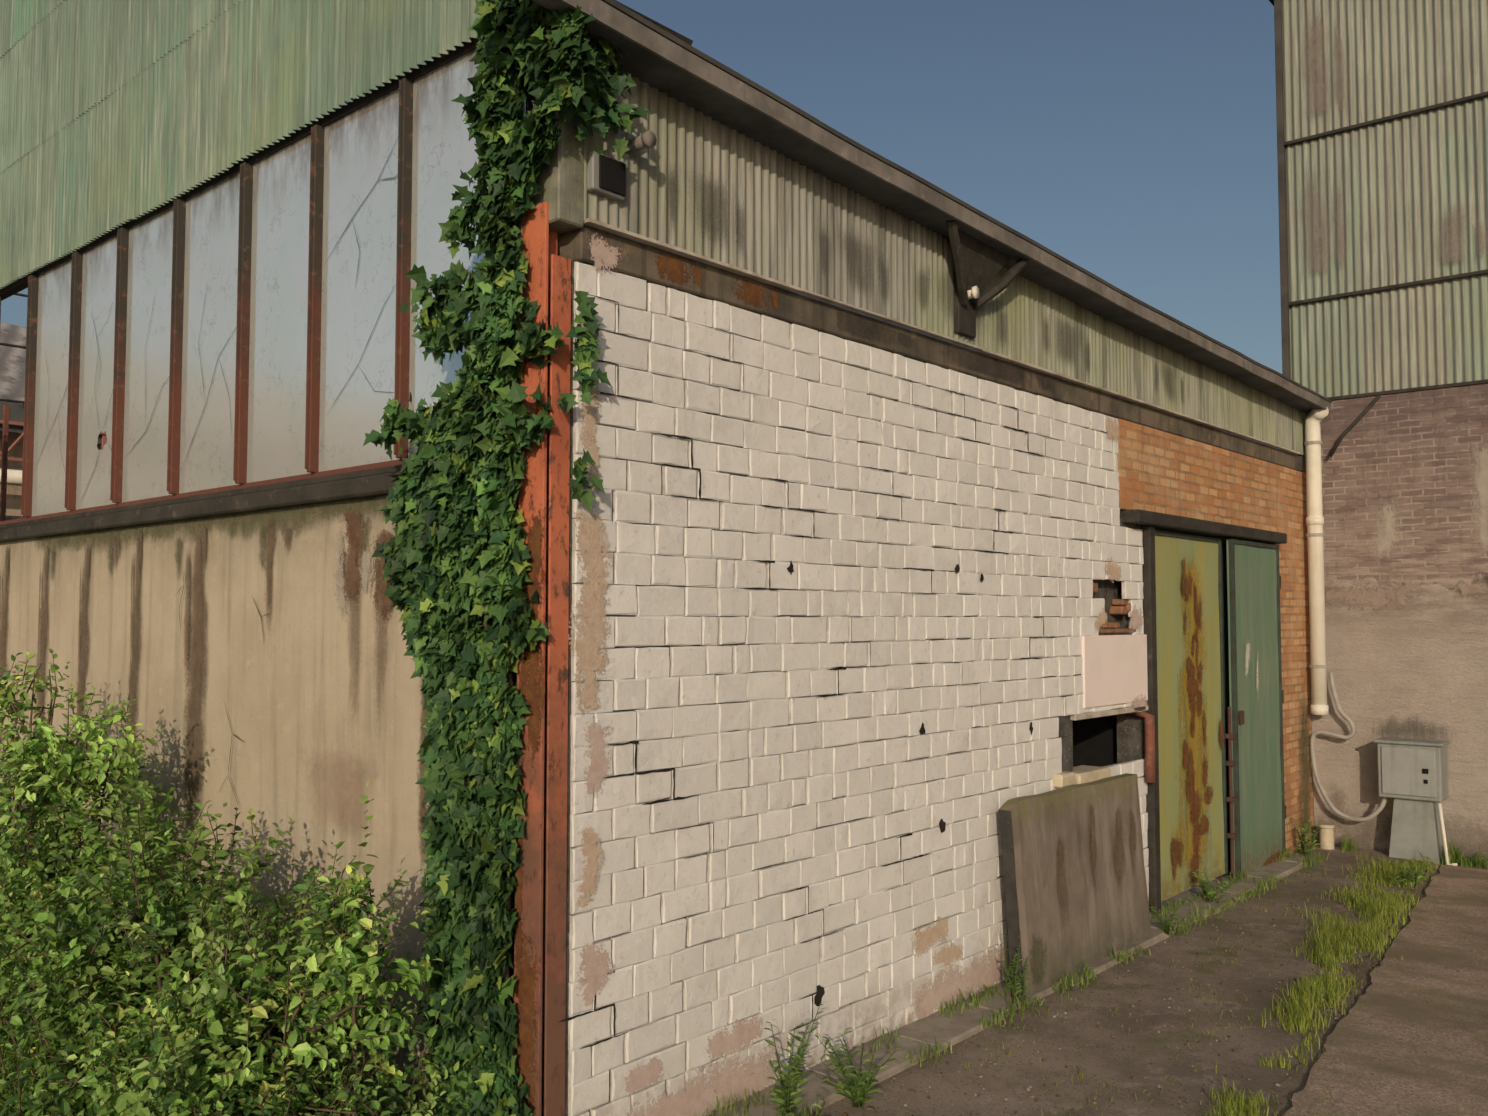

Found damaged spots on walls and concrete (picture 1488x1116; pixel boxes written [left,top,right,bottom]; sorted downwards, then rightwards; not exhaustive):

damp [701,181,744,239]
damp [849,237,887,296]
damp [0,546,9,686]
damp [35,495,392,830]
rust [519,507,546,771]
peeling [568,358,613,797]
spalling [1093,558,1144,634]
rust [1171,554,1224,889]
peeling [576,824,604,909]
peeling [577,941,614,1006]
peeling [616,1016,781,1116]